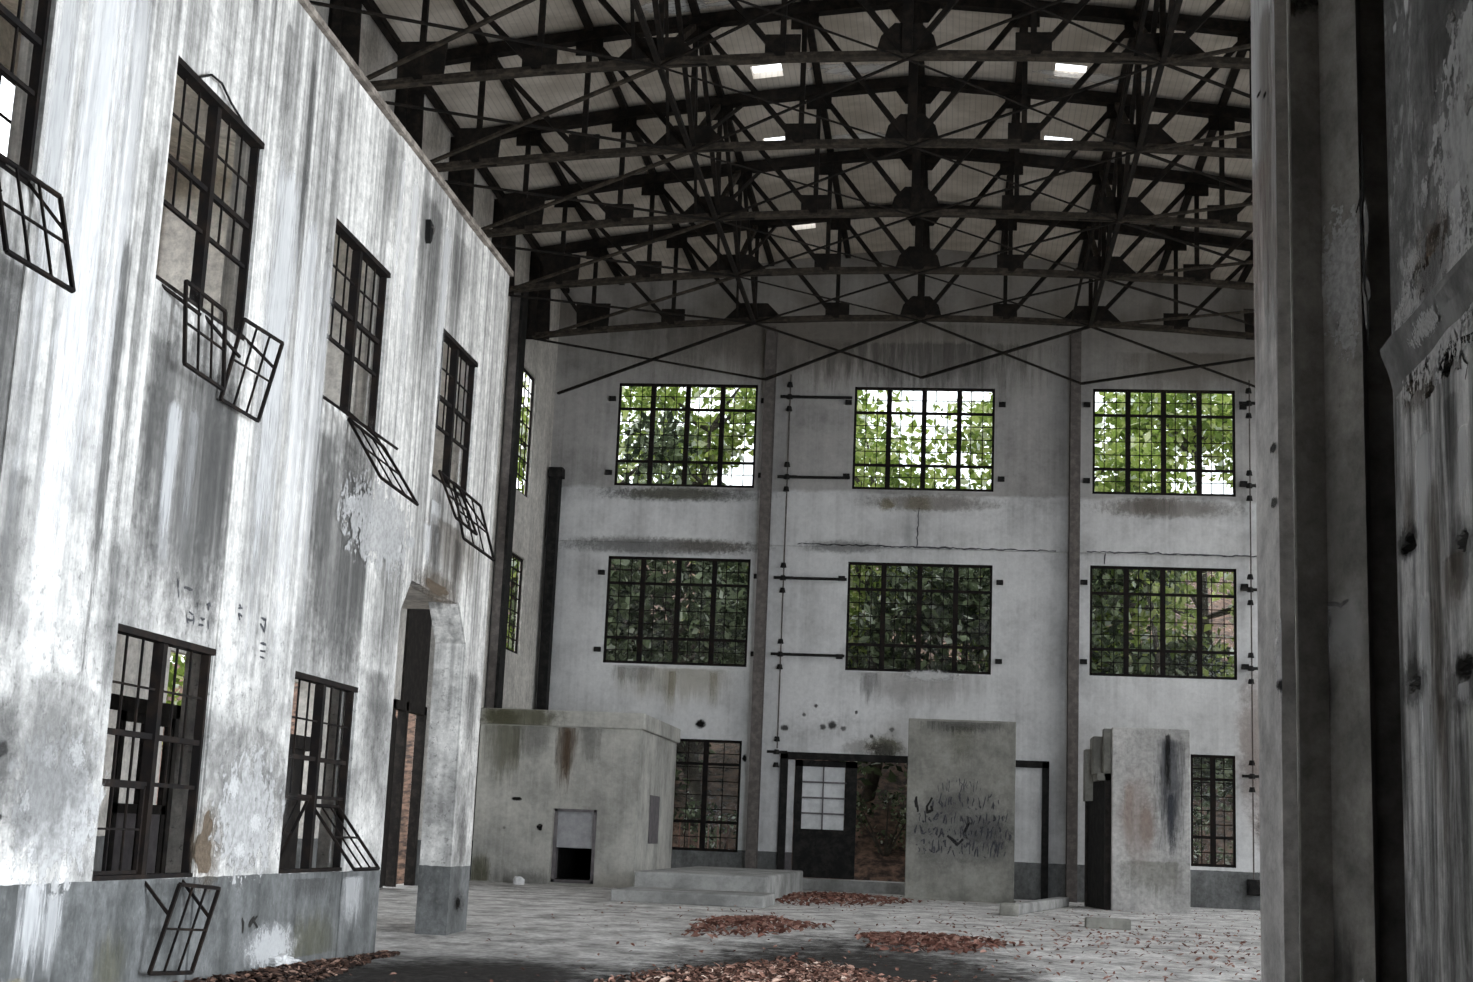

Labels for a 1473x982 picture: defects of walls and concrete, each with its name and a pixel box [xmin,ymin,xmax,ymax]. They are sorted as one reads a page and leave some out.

peeling [1394,0,1473,331]
peeling [1396,302,1473,402]